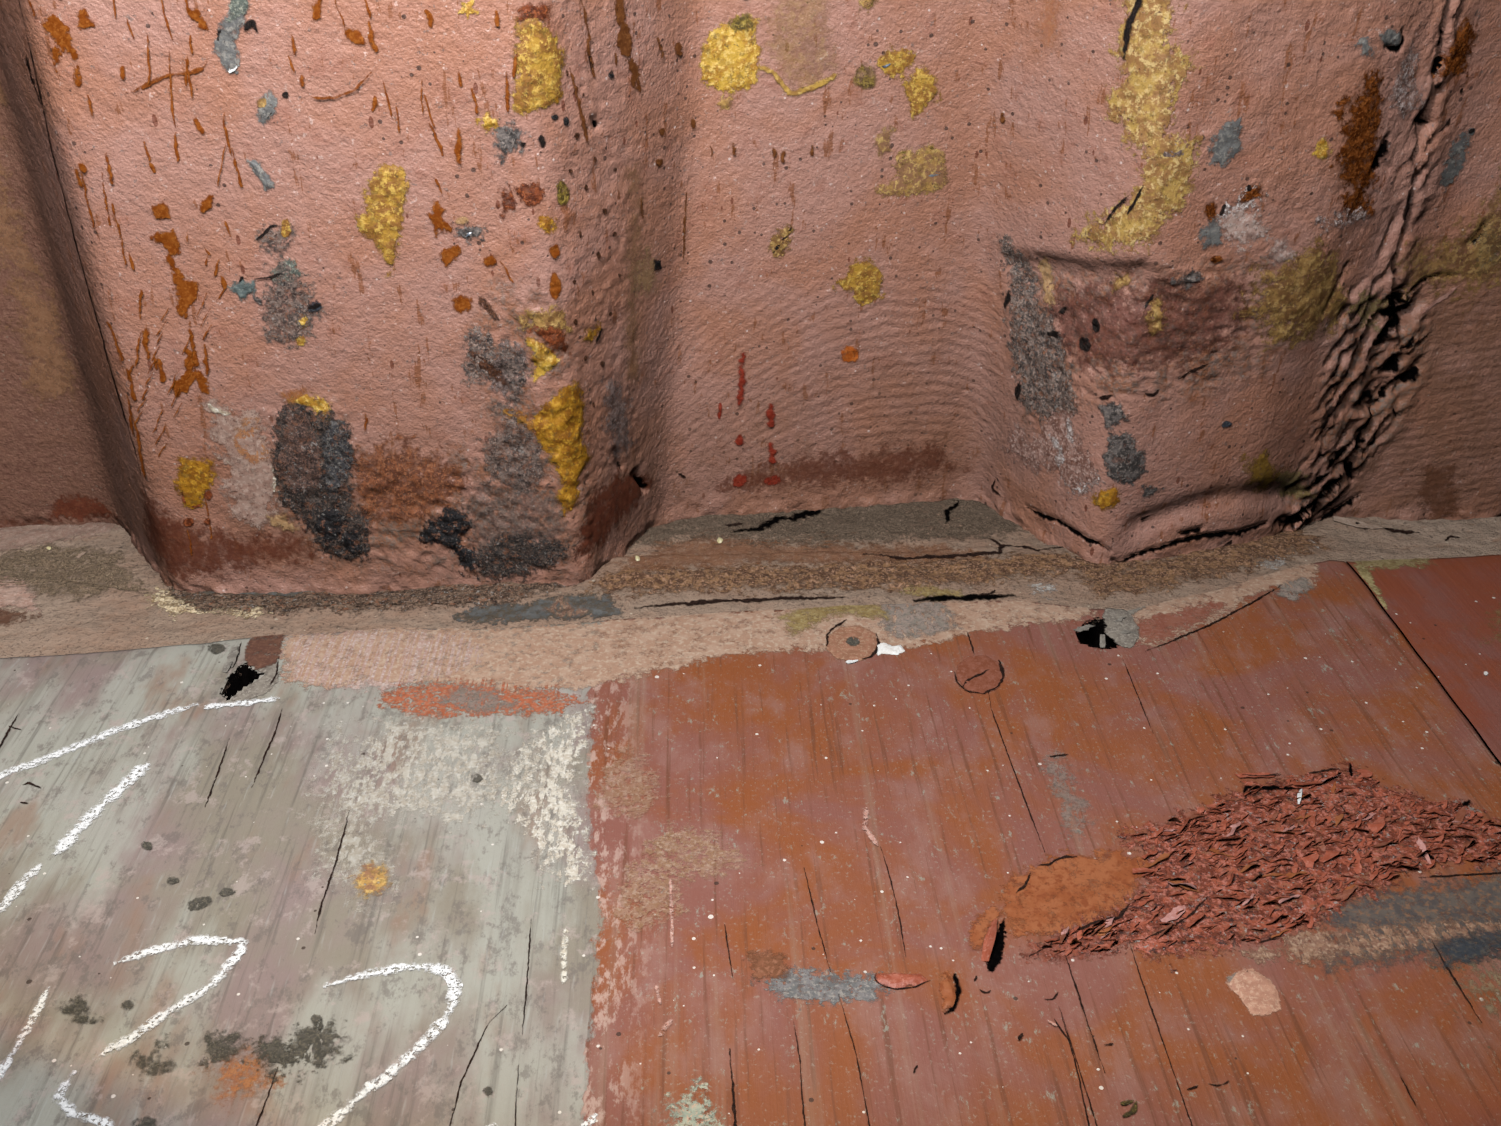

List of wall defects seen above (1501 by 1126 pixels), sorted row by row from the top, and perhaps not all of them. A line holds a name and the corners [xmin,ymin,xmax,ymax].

rust [28,0,95,116]
rust [113,0,209,162]
crack [1372,29,1463,168]
rust [106,202,227,556]
crack [726,510,821,532]
peeling [277,600,1099,694]
crack [634,596,843,608]
mould [188,888,235,911]
peeling [308,705,604,910]
peeling [968,757,1501,973]
damp [1241,868,1501,1014]
mould [199,1014,352,1083]